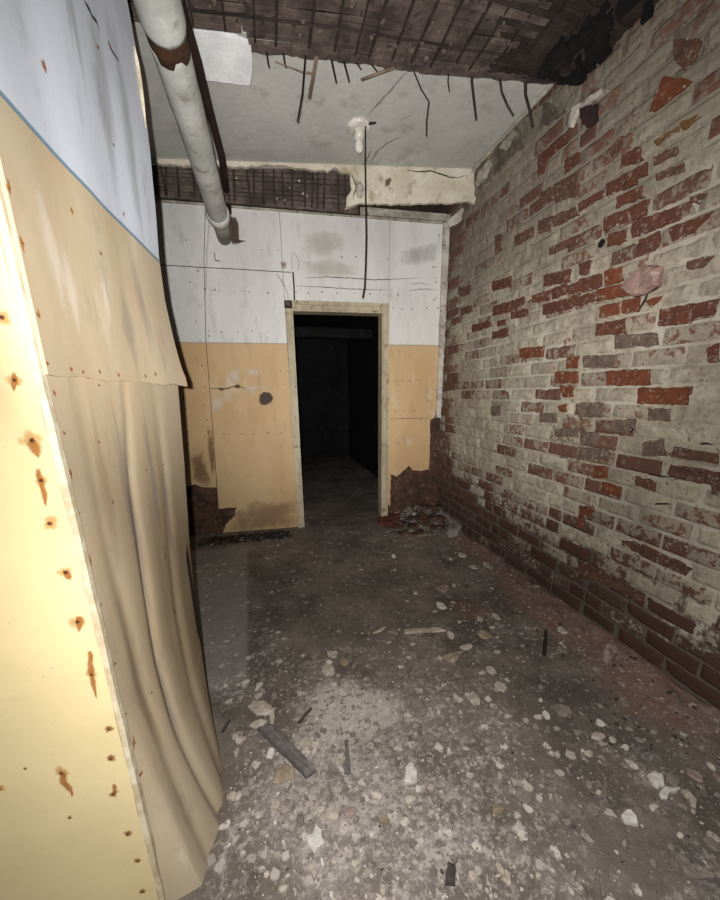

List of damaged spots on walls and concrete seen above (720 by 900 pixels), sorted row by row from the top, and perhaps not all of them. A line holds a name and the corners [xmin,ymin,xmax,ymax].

flaking render [127,0,140,22]
flaking render [184,0,659,136]
peeling [649,38,703,112]
flaking render [151,165,203,202]
flaking render [217,167,360,216]
crack [408,170,465,178]
peeling [495,89,714,256]
peeling [471,260,720,497]
corrosion [25,435,40,457]
corrosion [36,470,47,505]
corrosion [88,652,97,698]
corrosion [58,769,73,796]